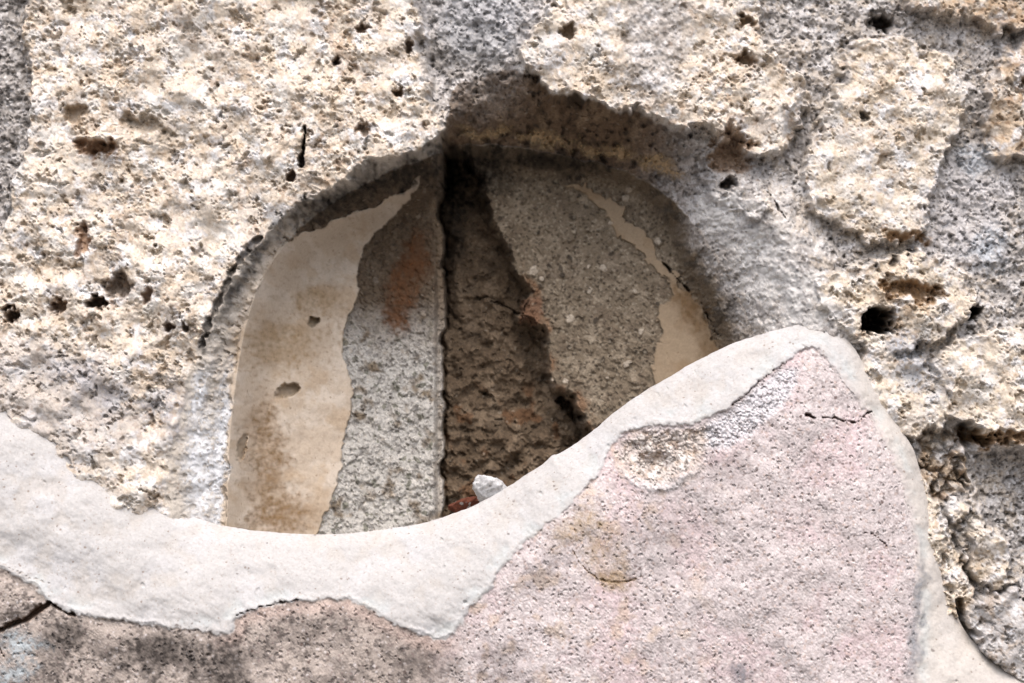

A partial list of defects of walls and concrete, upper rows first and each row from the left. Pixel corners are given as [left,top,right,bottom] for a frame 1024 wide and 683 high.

hole [391,85,405,100]
hole [353,119,373,141]
hole [285,169,297,183]
hole [719,175,739,193]
hole [307,316,320,328]
flaking render [318,150,721,535]
hole [274,382,302,400]
crack [805,411,873,425]
spalling [613,367,801,488]
spalling [228,433,249,475]
crack [0,563,77,658]